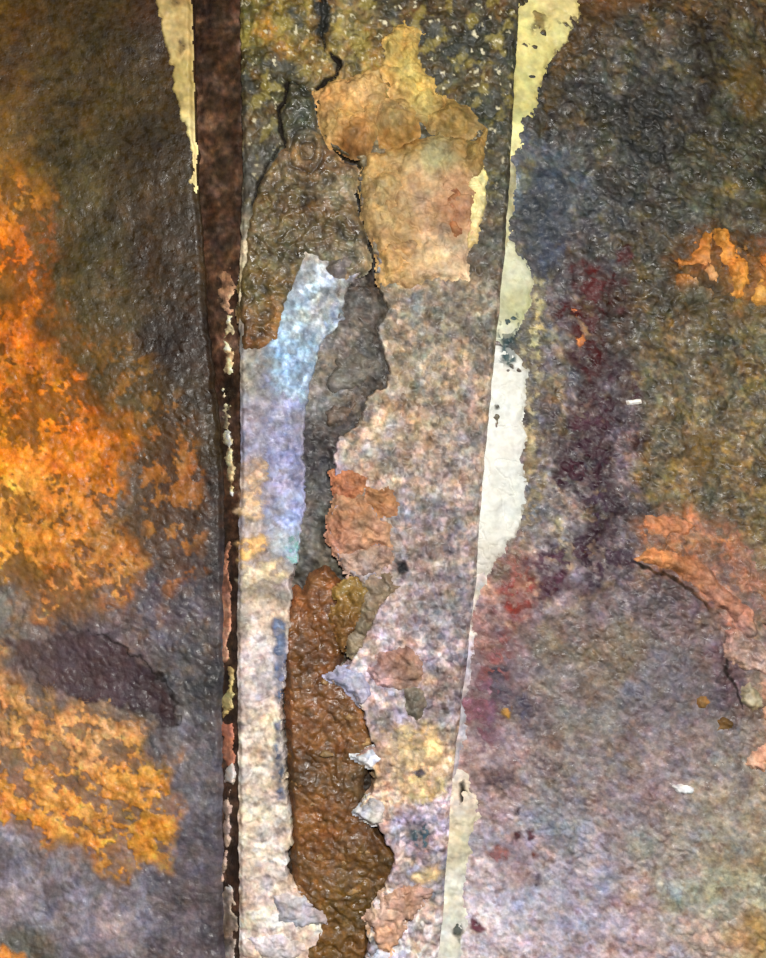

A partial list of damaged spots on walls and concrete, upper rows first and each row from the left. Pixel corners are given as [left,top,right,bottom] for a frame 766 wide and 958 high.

peeling [155,0,198,193]
crack [252,36,343,203]
peeling [312,20,488,289]
rust [663,228,766,319]
rust [0,158,202,621]
crack [291,239,389,590]
peeling [361,0,581,958]
peeling [322,469,427,720]
rust [0,945,25,958]
rust [0,674,178,881]
crack [281,691,289,780]
crack [285,848,293,874]